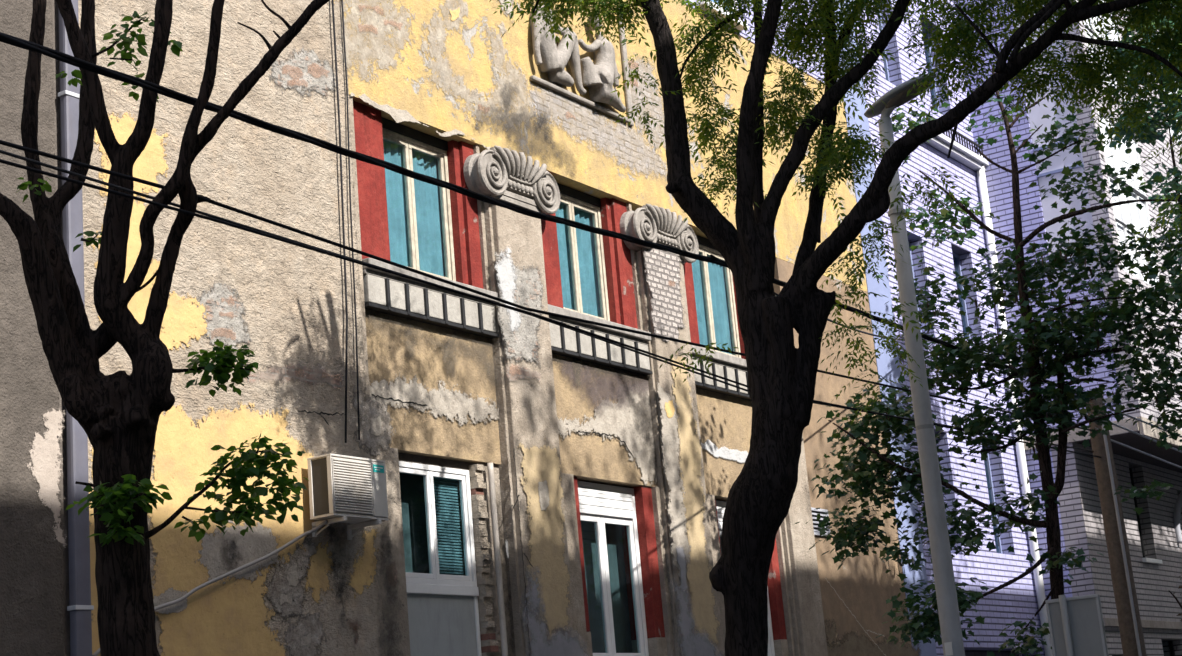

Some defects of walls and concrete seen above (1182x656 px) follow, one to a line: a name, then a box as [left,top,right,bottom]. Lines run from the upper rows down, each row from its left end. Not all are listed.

flaking render [269,0,667,178]
spalling [495,252,544,381]
peeling [26,408,67,548]
peeling [148,402,334,656]
peeling [346,528,380,598]
spalling [350,374,499,457]
peeling [518,242,720,647]